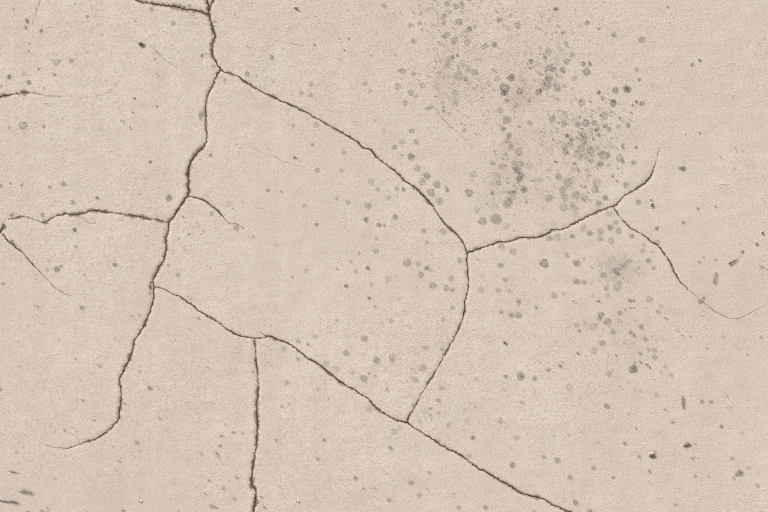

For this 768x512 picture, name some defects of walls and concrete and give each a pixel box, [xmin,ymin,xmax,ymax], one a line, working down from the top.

crack [0,216,63,293]
crack [44,0,655,512]
crack [622,220,688,290]